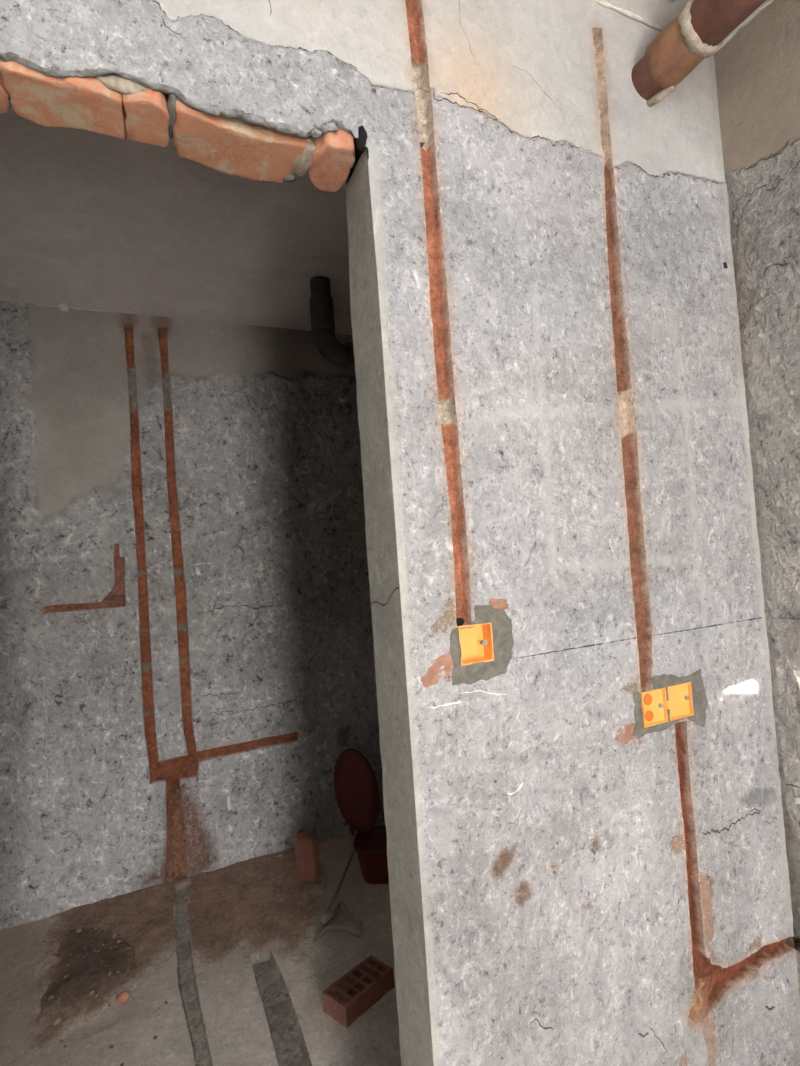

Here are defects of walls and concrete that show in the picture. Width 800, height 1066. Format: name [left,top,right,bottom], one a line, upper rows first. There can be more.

flaking render [0,52,368,155]